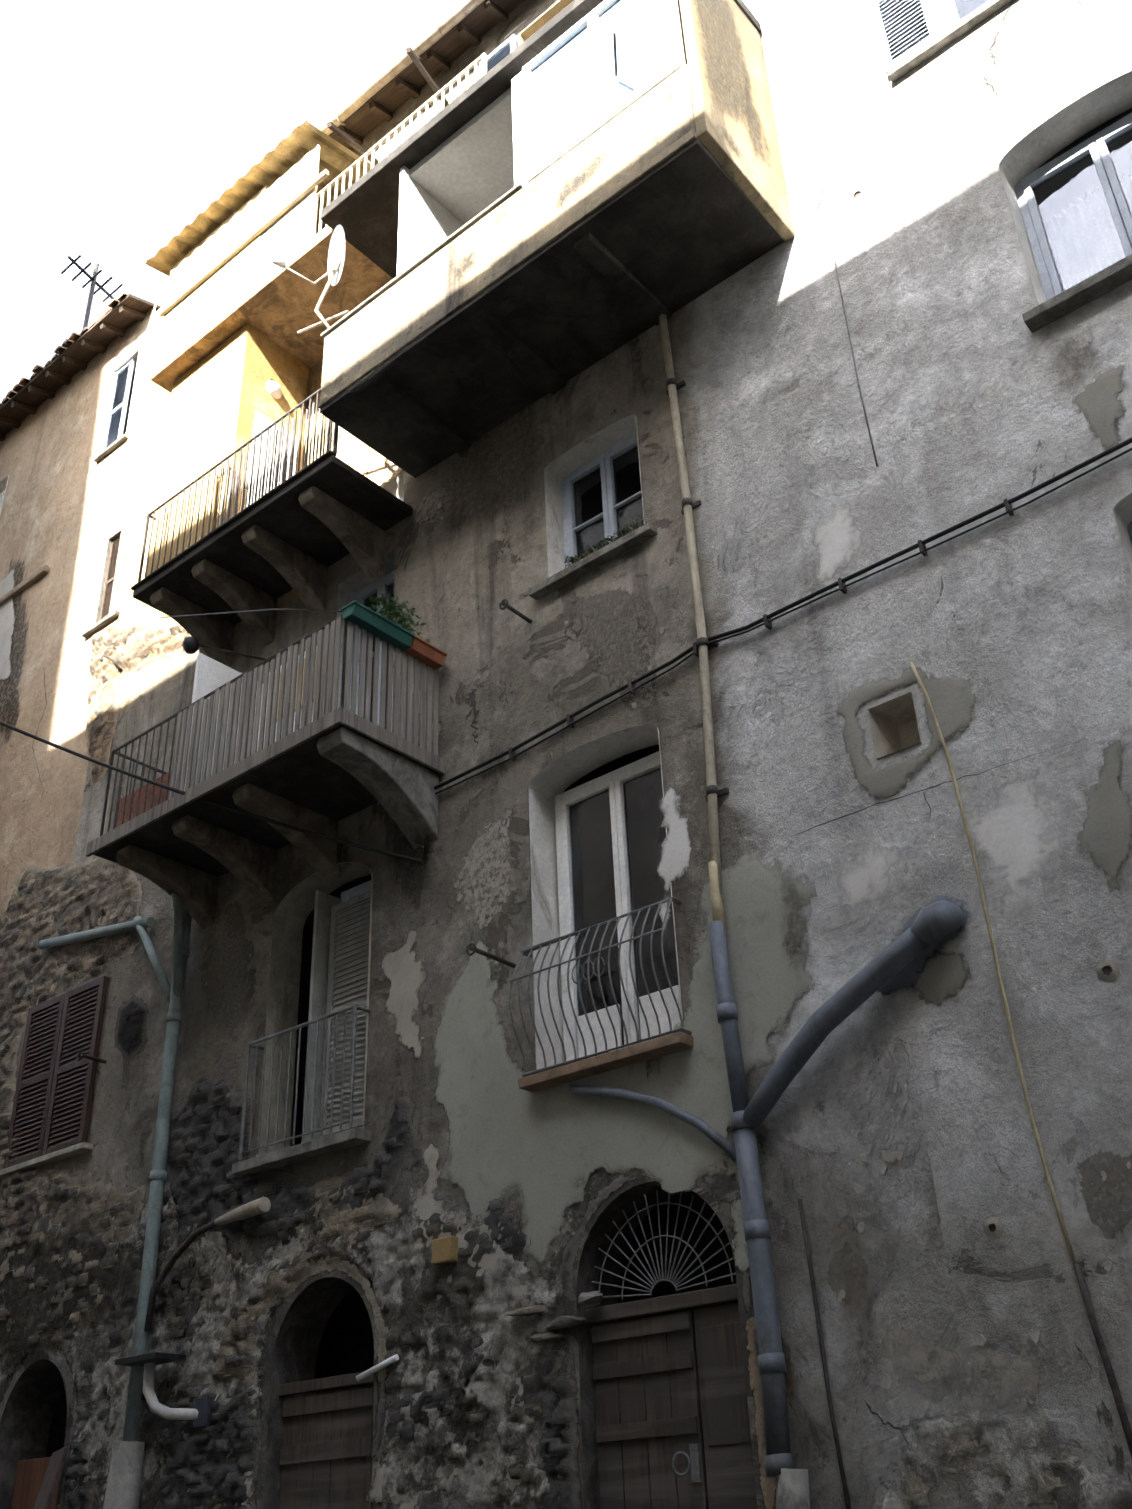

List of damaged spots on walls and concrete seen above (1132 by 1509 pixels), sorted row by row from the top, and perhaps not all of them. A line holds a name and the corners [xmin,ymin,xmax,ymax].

water stain [694,0,767,156]
crack [970,0,1102,147]
peeling [564,587,666,711]
spalling [114,994,149,1063]
peeling [1077,1150,1132,1239]
flaking render [0,1170,643,1509]